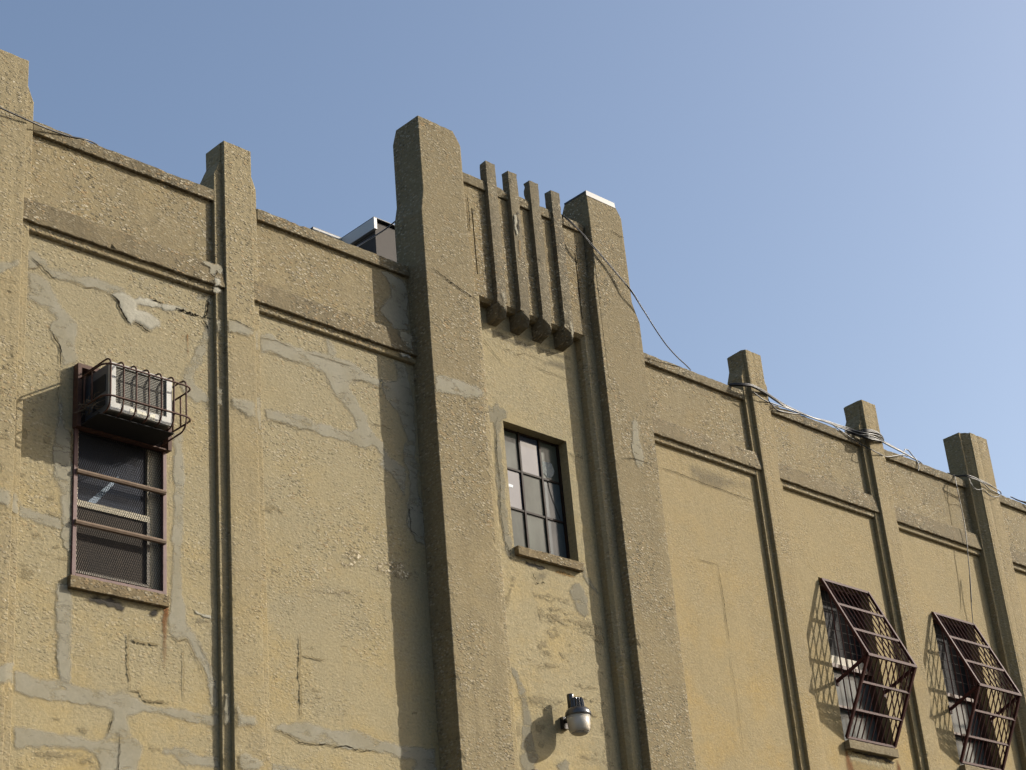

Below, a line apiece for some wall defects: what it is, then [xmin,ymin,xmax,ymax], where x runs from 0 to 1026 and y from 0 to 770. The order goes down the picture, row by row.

crack [1,258,151,333]
crack [153,272,380,388]
crack [127,635,211,703]
crack [279,637,377,753]